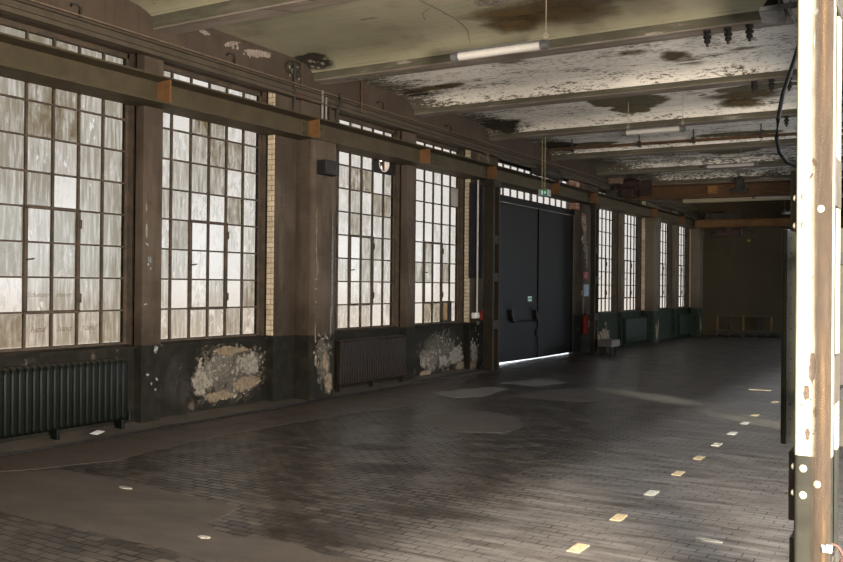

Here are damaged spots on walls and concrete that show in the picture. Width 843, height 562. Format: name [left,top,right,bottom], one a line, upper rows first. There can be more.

damp [476,0,611,31]
peeling [586,95,671,114]
peeling [695,130,783,138]
peeling [700,148,761,156]
peeling [313,323,332,394]
peeling [415,321,480,376]
peeling [188,343,266,406]